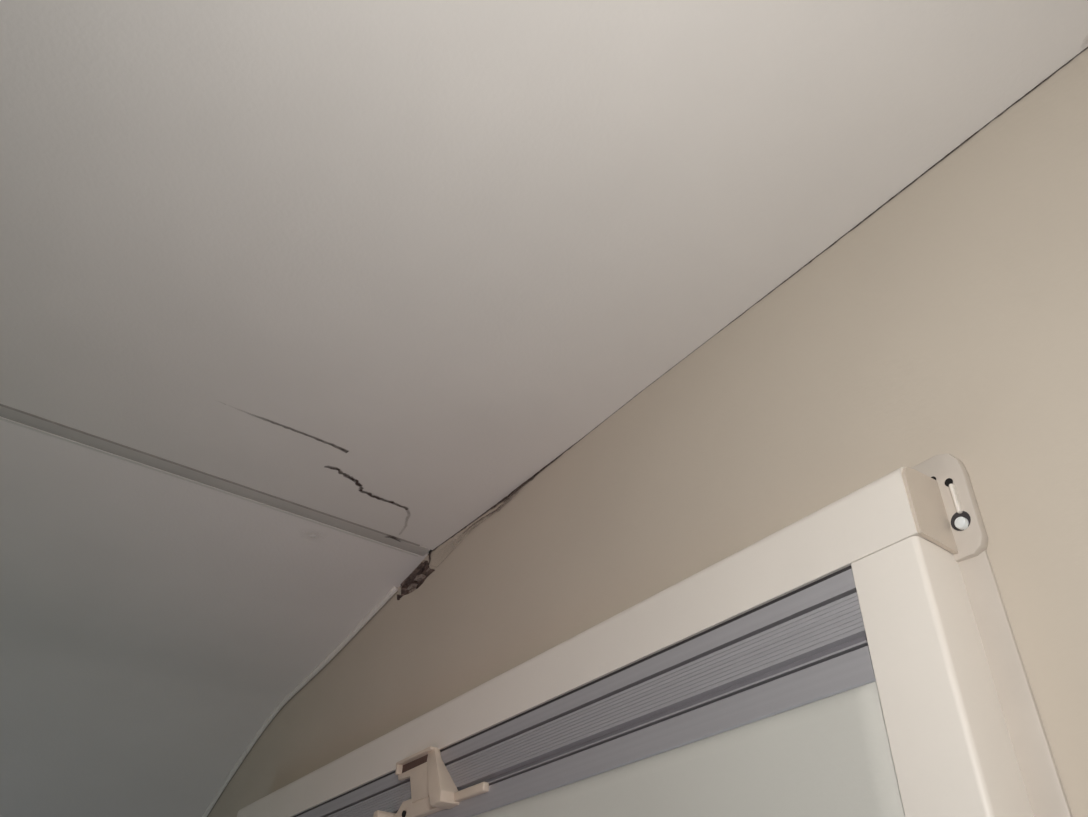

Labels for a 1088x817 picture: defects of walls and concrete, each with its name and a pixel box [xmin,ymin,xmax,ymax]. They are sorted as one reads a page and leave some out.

crack [721,47,1088,330]
crack [268,420,408,510]
crack [428,434,587,565]